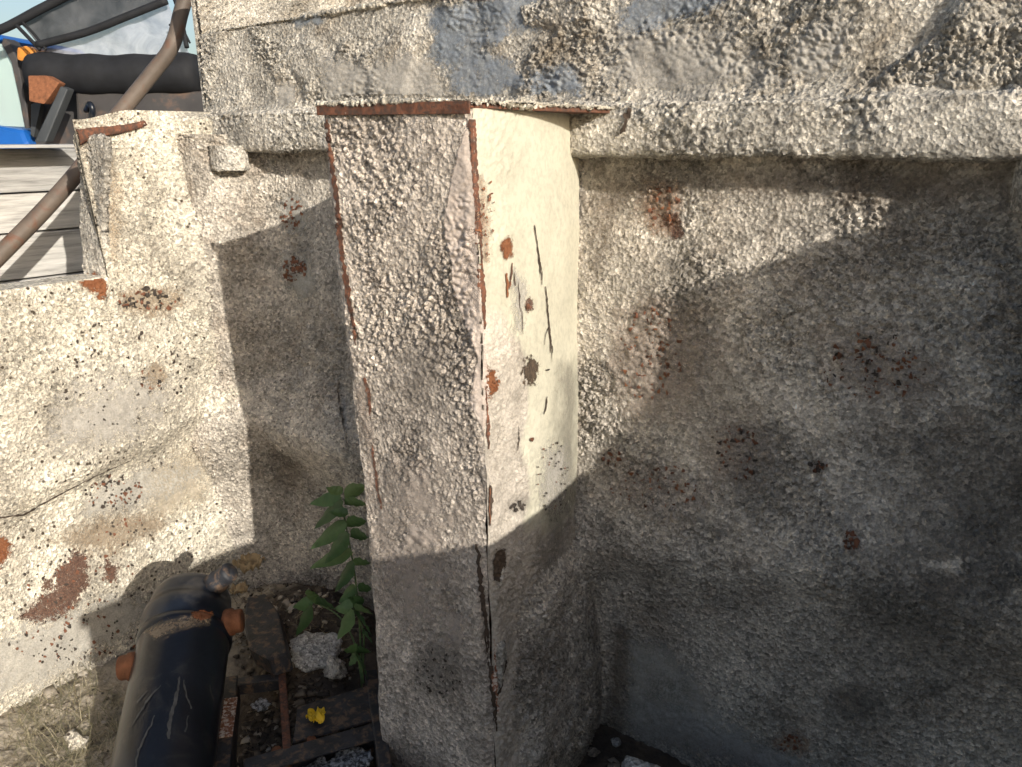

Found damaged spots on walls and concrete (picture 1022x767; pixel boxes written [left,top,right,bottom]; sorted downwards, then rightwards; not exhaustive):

rust [276,194,308,235]
rust [324,119,357,345]
rust [467,119,514,329]
rust [638,181,684,239]
rust [78,271,108,301]
rust [279,251,315,300]
rust [363,378,371,416]
rust [371,445,382,510]
rust [0,534,14,570]
rust [18,512,165,626]
rust [842,531,860,550]
crack [472,485,508,731]